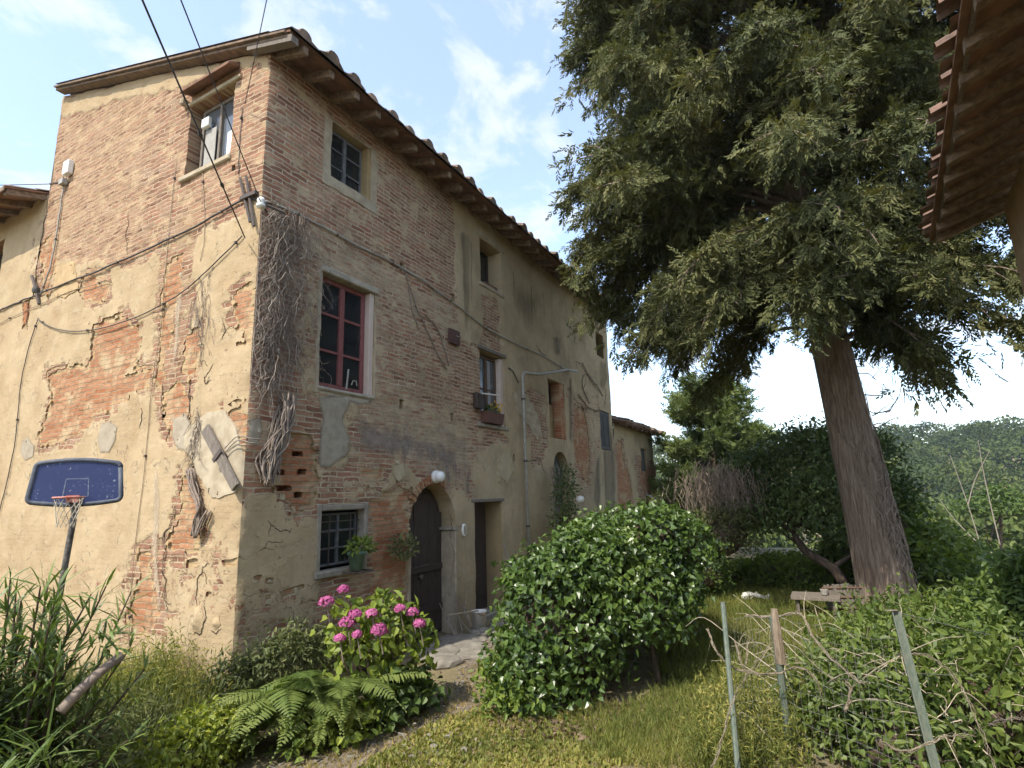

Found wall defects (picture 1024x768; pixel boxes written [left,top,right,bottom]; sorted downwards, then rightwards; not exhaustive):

flaking render [25,253,202,448]
flaking render [229,397,261,440]
flaking render [126,466,218,641]
flaking render [224,557,238,567]